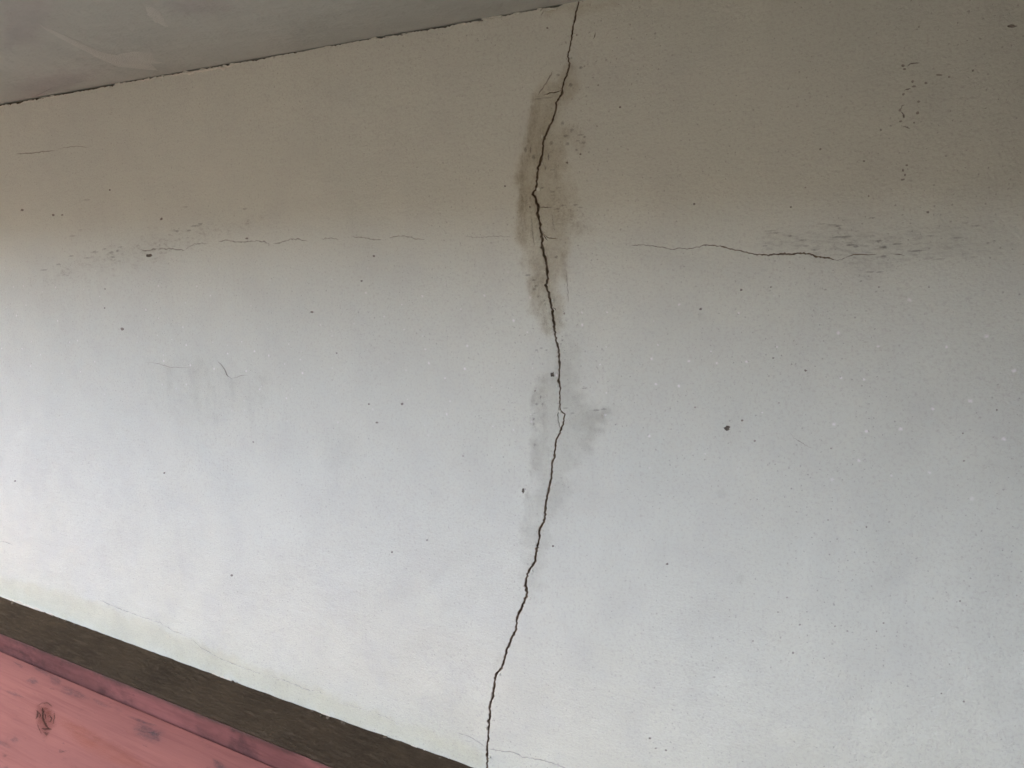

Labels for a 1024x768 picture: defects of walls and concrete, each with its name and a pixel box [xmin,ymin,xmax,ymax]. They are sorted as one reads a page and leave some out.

crack [0,2,579,768]
crack [633,244,904,261]